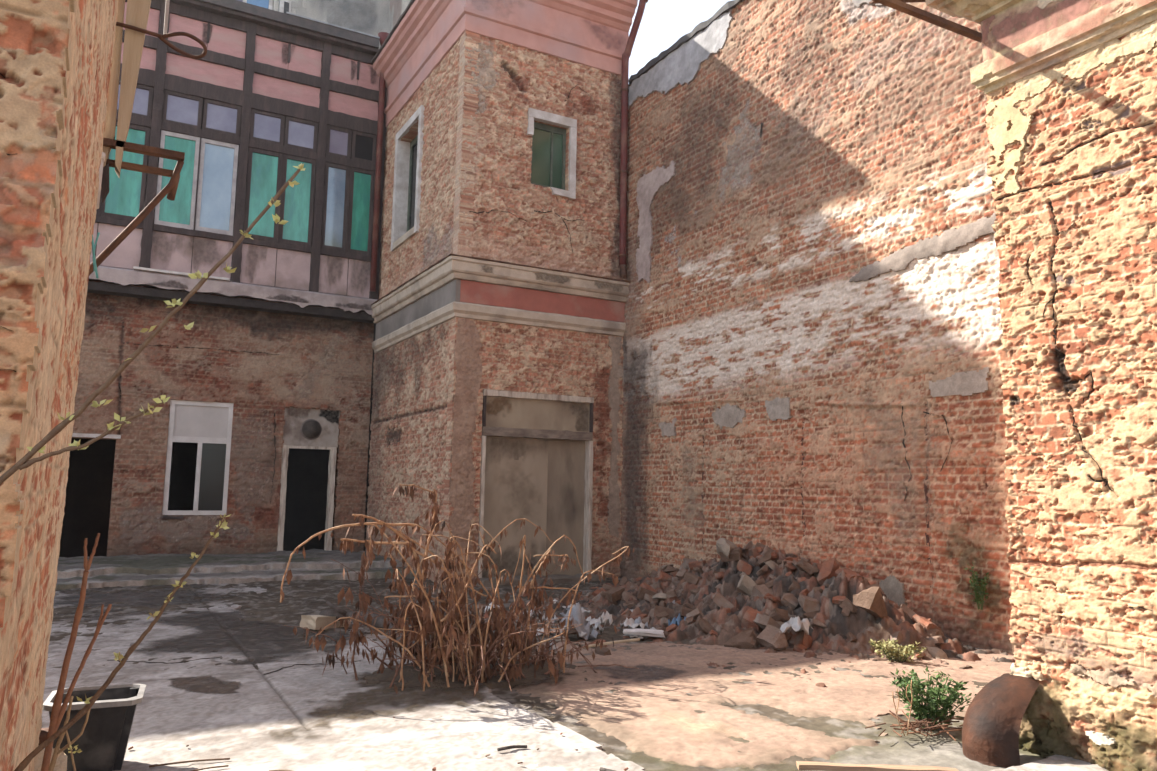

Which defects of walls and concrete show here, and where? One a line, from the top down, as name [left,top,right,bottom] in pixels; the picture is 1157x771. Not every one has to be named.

peeling [981,0,1115,69]
crack [996,123,1156,497]
flaking render [929,367,989,397]
flaking render [712,403,746,429]
flaking render [765,397,792,421]